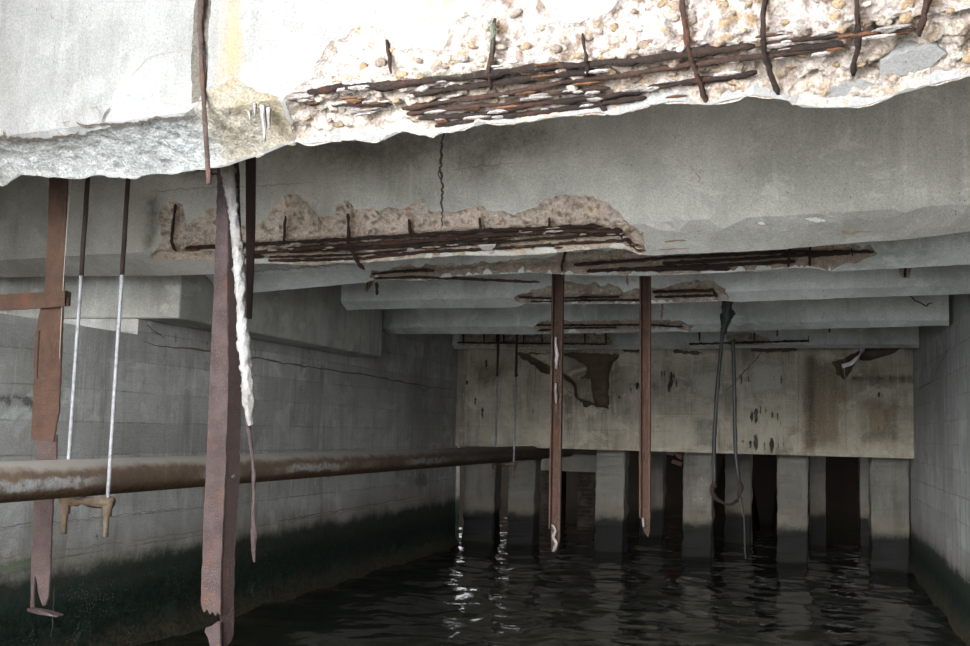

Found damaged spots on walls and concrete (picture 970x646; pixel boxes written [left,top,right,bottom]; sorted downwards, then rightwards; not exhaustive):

spalling [0,0,970,186]
crack [154,169,217,192]
crack [438,133,514,232]
spalling [147,200,216,266]
spalling [241,193,877,304]
leakage [220,164,255,426]
spalling [457,321,551,374]
spalling [563,319,639,409]
spalling [651,319,809,346]
spalling [832,348,901,380]